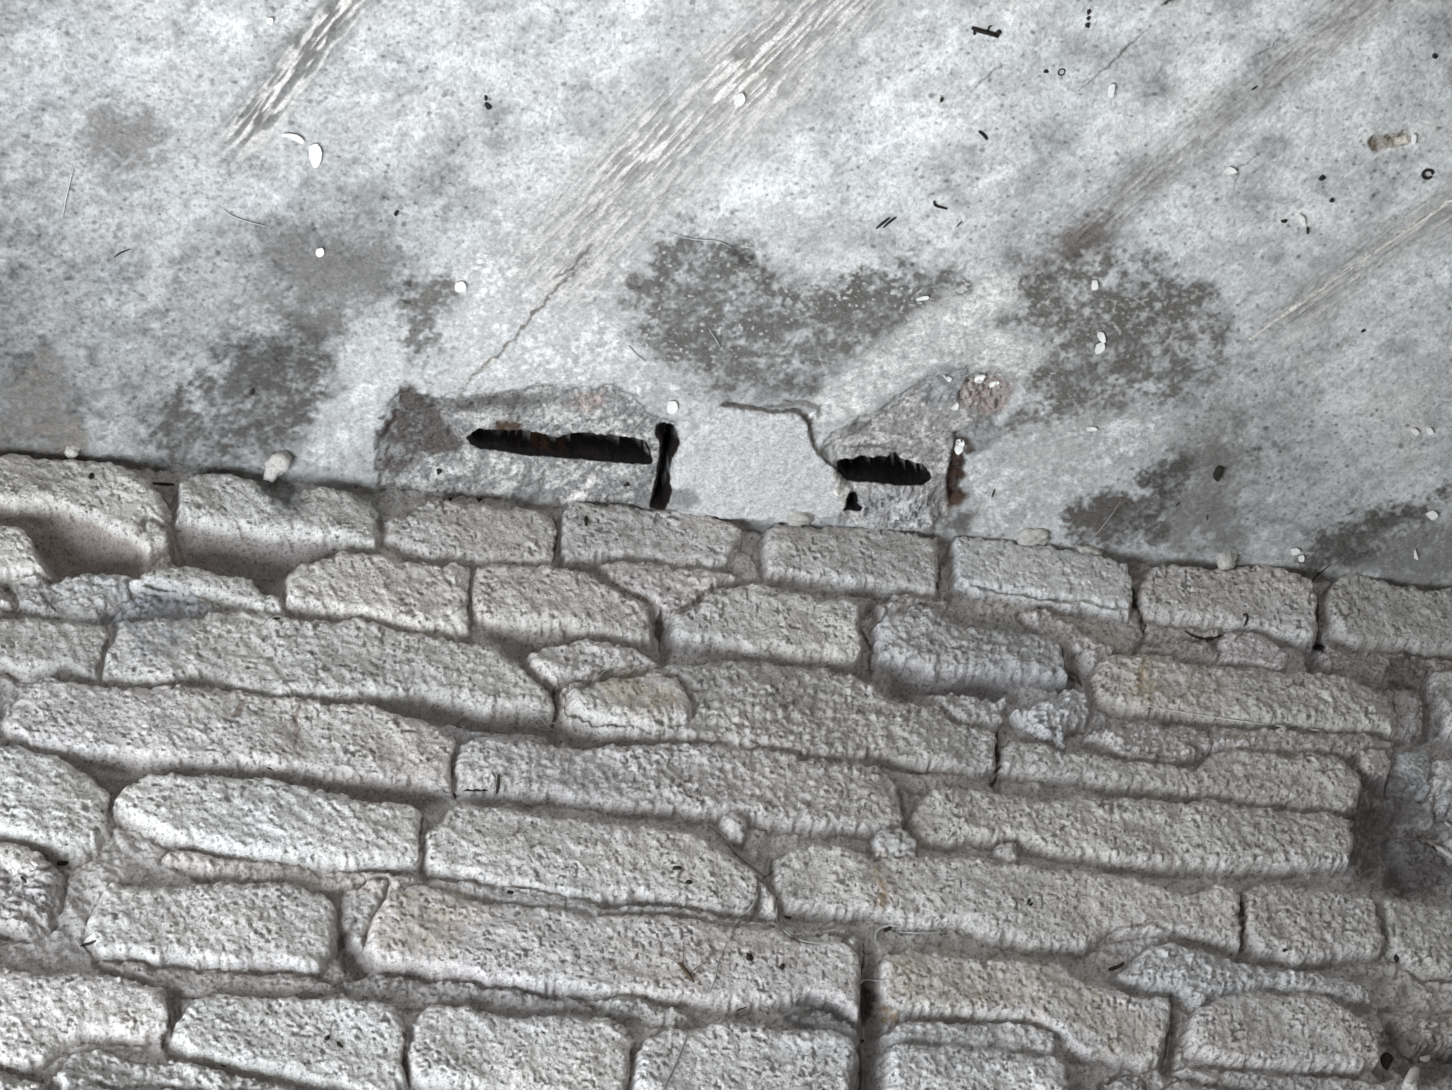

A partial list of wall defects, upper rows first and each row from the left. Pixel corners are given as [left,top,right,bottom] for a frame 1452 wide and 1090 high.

leakage [0,348,89,457]
leakage [142,226,458,471]
spalling [375,384,678,509]
leakage [618,236,971,395]
spalling [829,364,1014,531]
rust [945,436,975,508]
leakage [996,213,1229,433]
leakage [1296,485,1452,590]